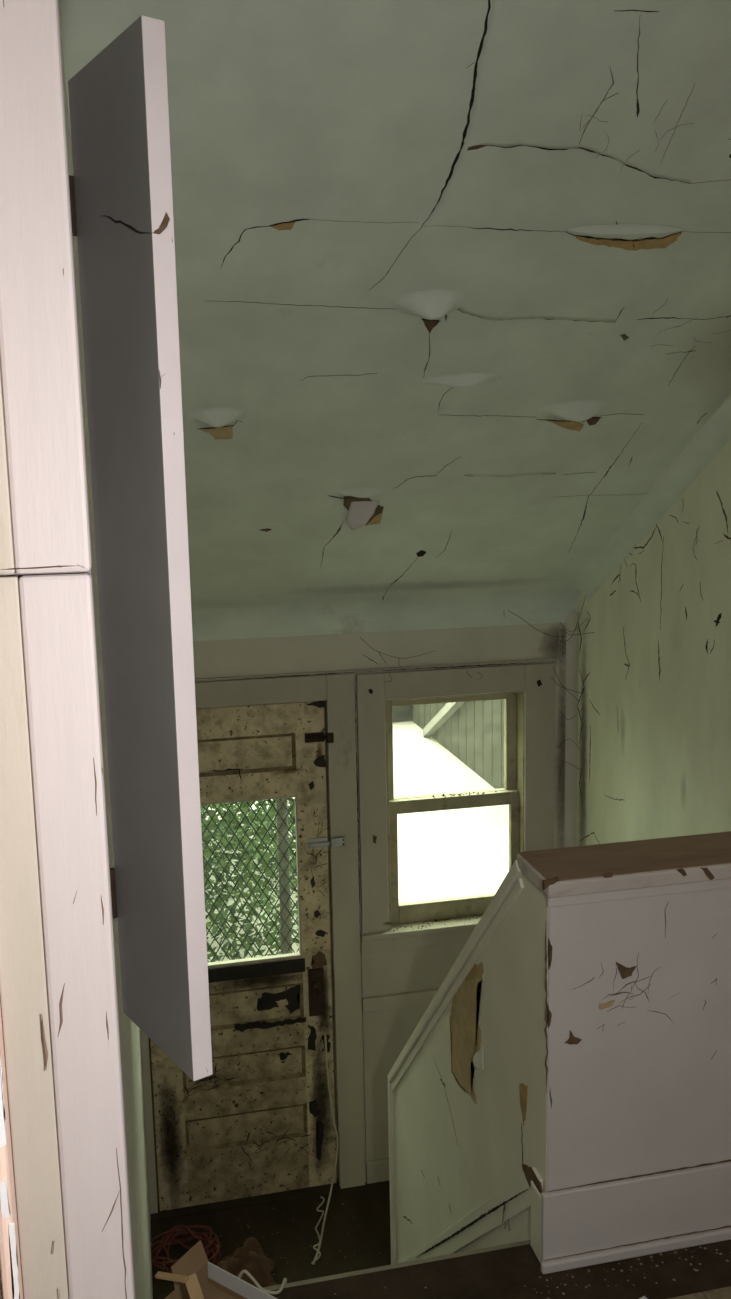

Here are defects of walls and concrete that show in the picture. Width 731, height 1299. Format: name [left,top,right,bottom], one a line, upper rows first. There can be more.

crack [218,0,731,309]
crack [105,215,148,234]
flaking render [269,219,310,231]
flaking render [566,221,685,251]
flaking render [422,318,440,333]
crack [423,307,731,417]
flaking render [197,425,234,440]
flaking render [538,417,602,431]
flaking render [328,495,384,530]
flaking render [450,962,485,1104]
flaking render [519,1083,528,1126]
spalling [522,1164,543,1193]